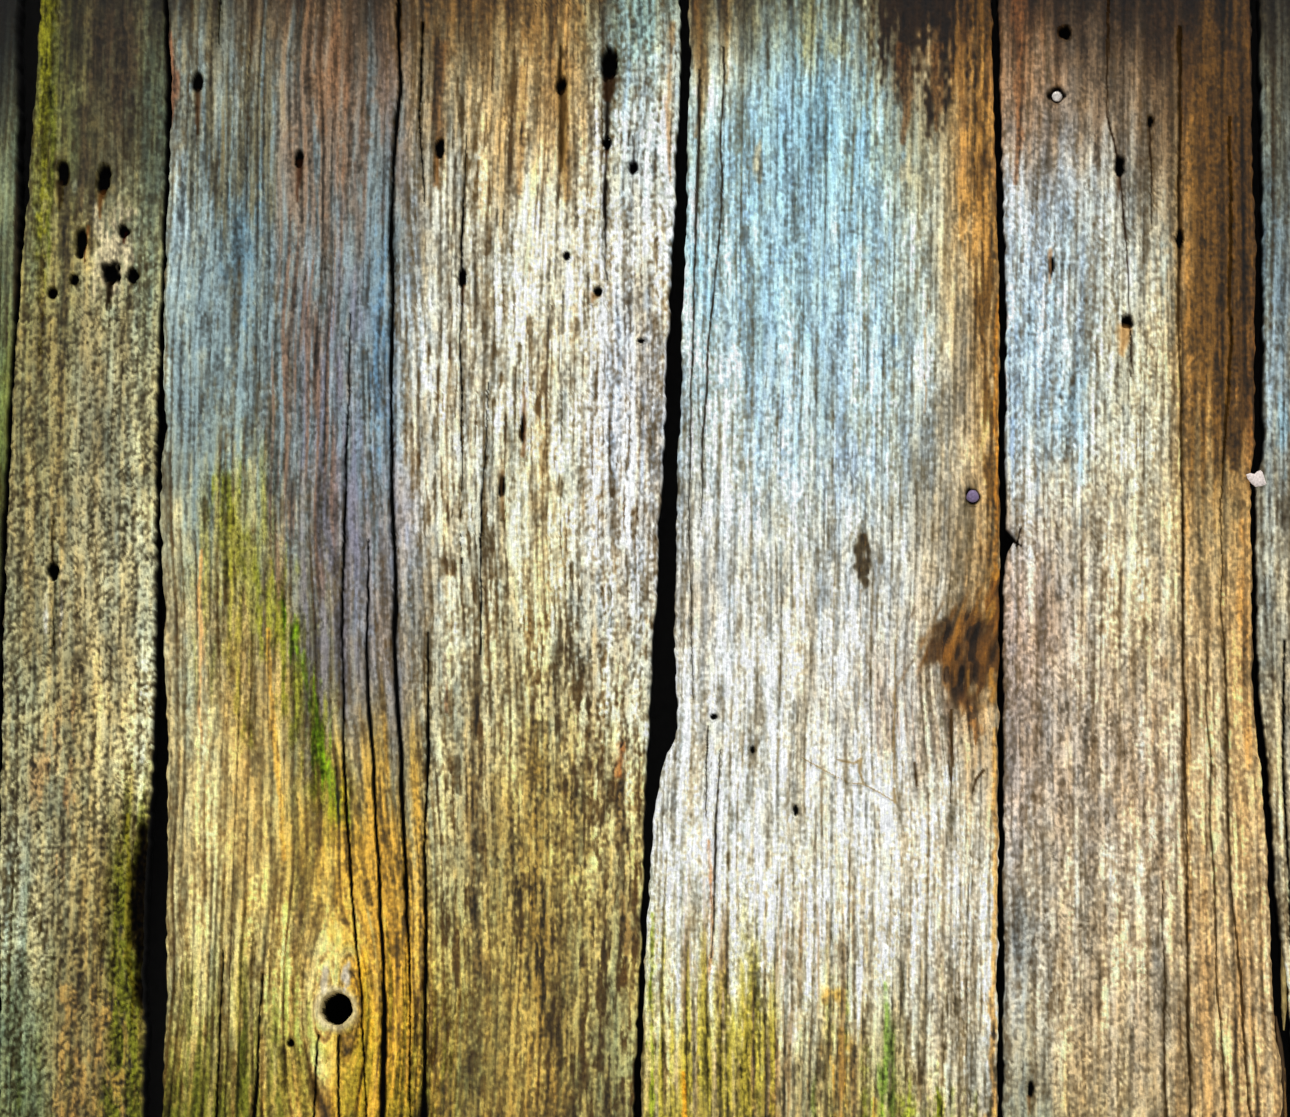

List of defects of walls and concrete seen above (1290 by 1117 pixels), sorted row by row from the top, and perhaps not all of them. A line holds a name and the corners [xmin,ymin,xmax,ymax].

crack [458,134,468,268]
crack [214,949,226,1117]
crack [251,971,265,1117]
damp [180,415,338,792]
crack [312,0,432,1117]
crack [457,311,490,656]
damp [167,647,993,1117]
damp [857,490,1000,789]
crack [1280,638,1290,958]